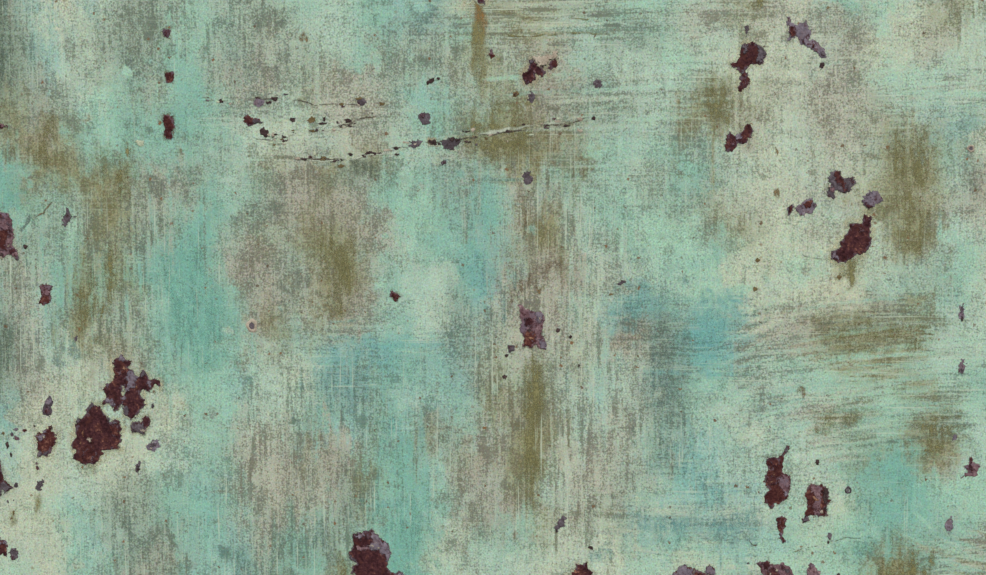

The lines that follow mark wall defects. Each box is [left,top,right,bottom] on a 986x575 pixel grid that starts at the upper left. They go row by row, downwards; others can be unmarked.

peeling [146,439,161,452]